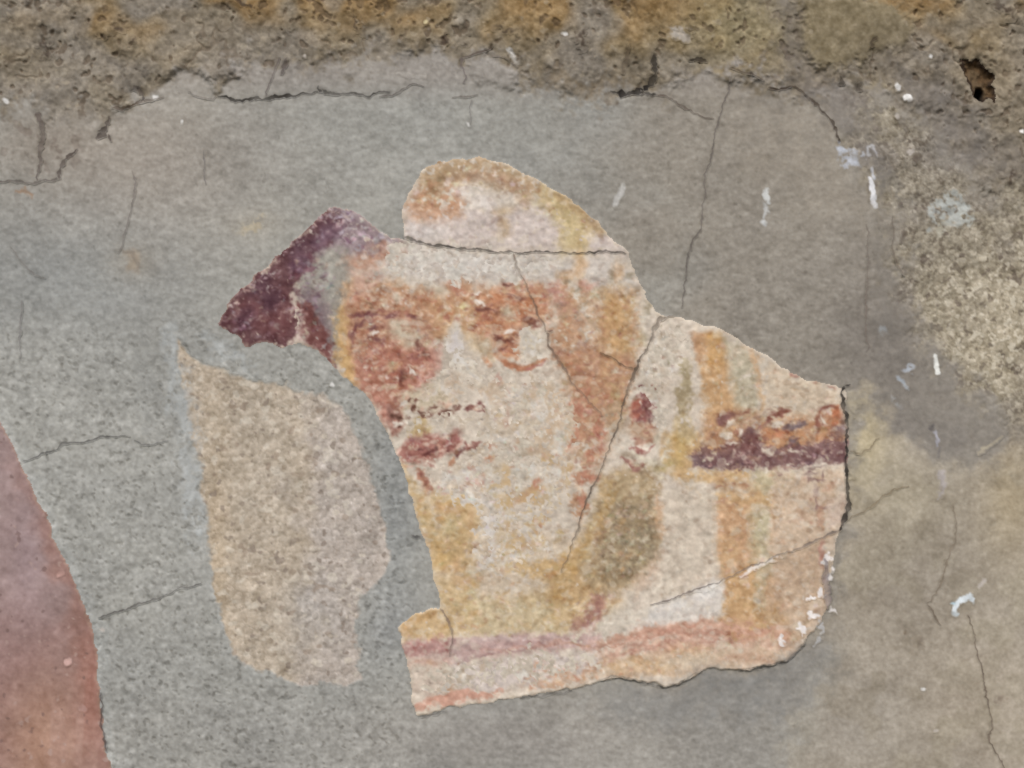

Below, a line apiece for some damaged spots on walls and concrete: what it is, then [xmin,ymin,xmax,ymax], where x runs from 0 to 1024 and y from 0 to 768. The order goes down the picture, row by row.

crack [0,111,78,185]
spalling [838,76,867,94]
crack [403,43,841,572]
leakage [755,0,1024,501]
spalling [879,106,1024,419]
crack [22,435,168,463]
crack [650,384,909,606]
crack [926,505,958,626]
crack [967,615,1005,768]